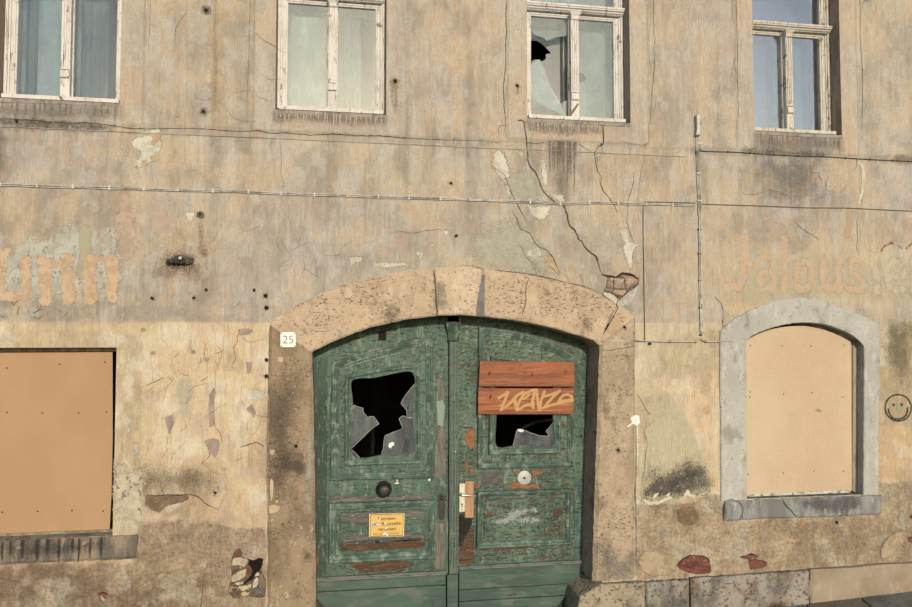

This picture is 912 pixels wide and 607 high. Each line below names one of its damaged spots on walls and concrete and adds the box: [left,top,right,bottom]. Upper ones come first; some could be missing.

crack [0,4,442,187]
peeling [121,128,163,168]
peeling [471,147,574,274]
crack [462,0,692,356]
spalling [603,227,640,299]
peeling [165,415,174,434]
peeling [204,388,220,458]
peeling [111,460,189,522]
spalling [228,548,266,599]